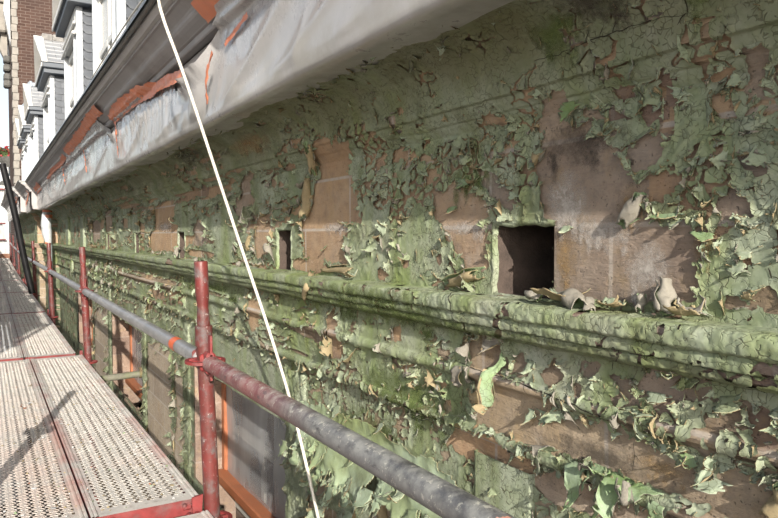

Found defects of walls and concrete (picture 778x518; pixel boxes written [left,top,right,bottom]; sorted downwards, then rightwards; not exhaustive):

crack [535,0,688,61]
peeling [69,35,778,318]
peeling [86,258,197,406]
peeling [134,327,193,477]
peeling [211,284,778,518]
peeling [149,457,178,498]